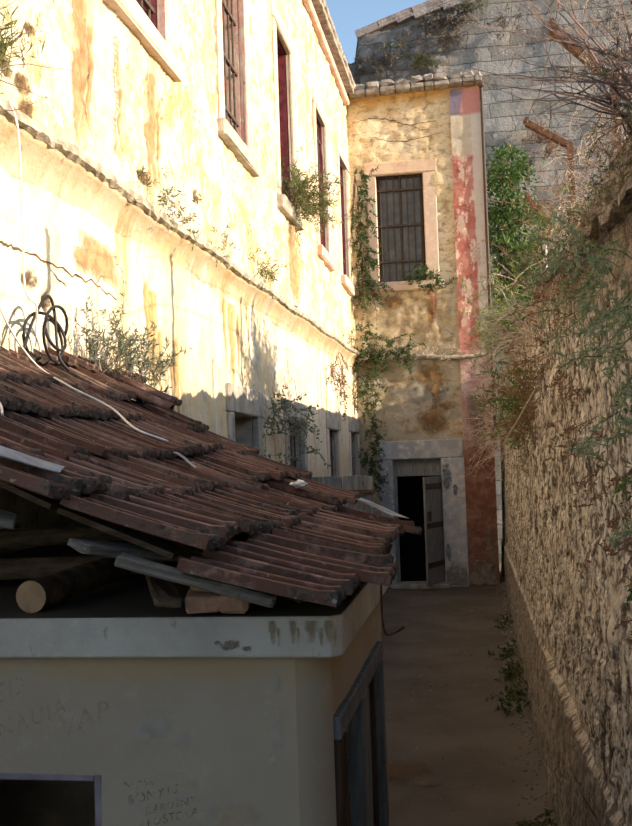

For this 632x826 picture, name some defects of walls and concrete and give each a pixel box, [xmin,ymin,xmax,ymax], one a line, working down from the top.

water stain [73,0,94,134]
water stain [113,37,123,149]
crack [359,118,442,145]
crack [0,241,117,300]
peeling [457,209,481,265]
water stain [395,364,454,431]